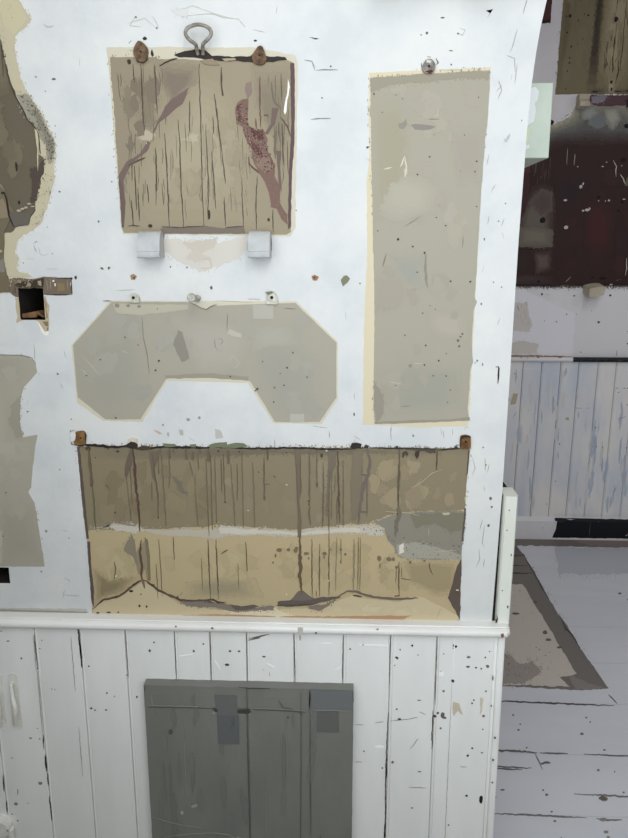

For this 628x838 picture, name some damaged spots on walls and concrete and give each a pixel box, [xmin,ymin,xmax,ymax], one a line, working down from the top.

peeling [0,0,77,336]
peeling [70,46,491,621]
peeling [516,0,628,291]